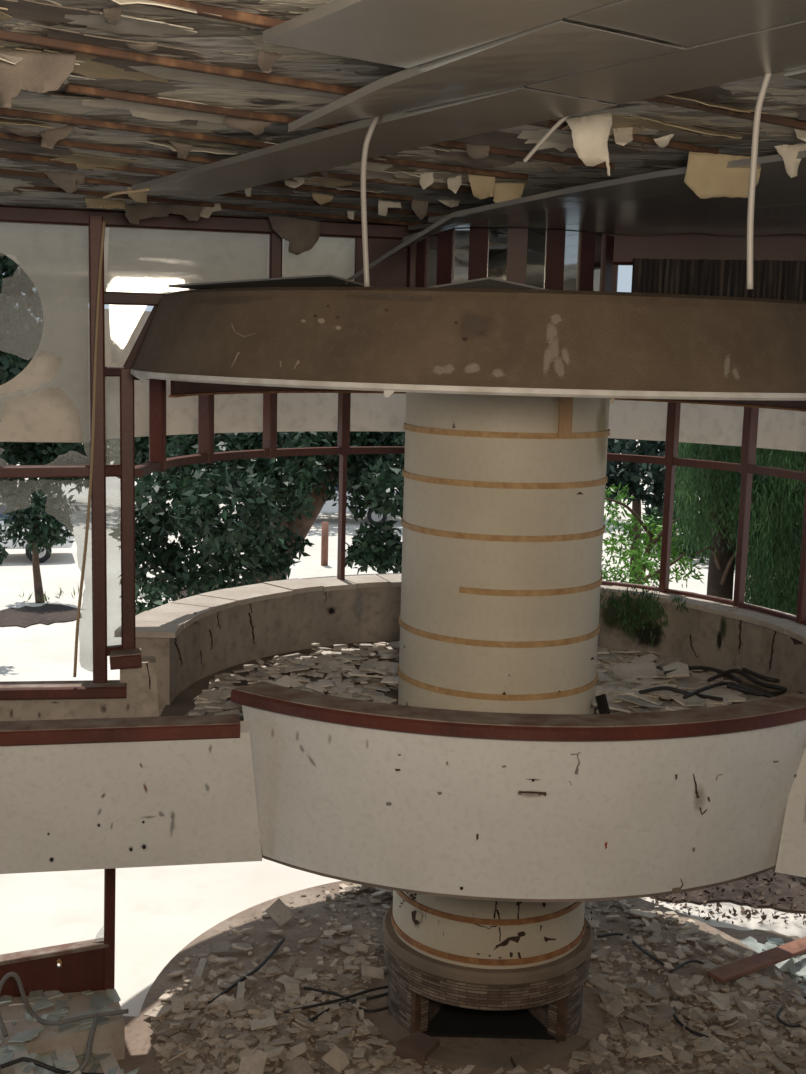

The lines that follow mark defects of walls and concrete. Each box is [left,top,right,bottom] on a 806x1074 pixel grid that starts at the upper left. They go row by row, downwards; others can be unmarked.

peeling [0,0,305,224]
peeling [638,85,766,114]
peeling [774,106,806,178]
peeling [285,111,762,221]
crack [174,612,220,669]
crack [247,603,255,645]
crack [737,620,745,654]
crack [768,631,776,672]
peeling [399,892,421,925]
peeling [477,931,526,959]